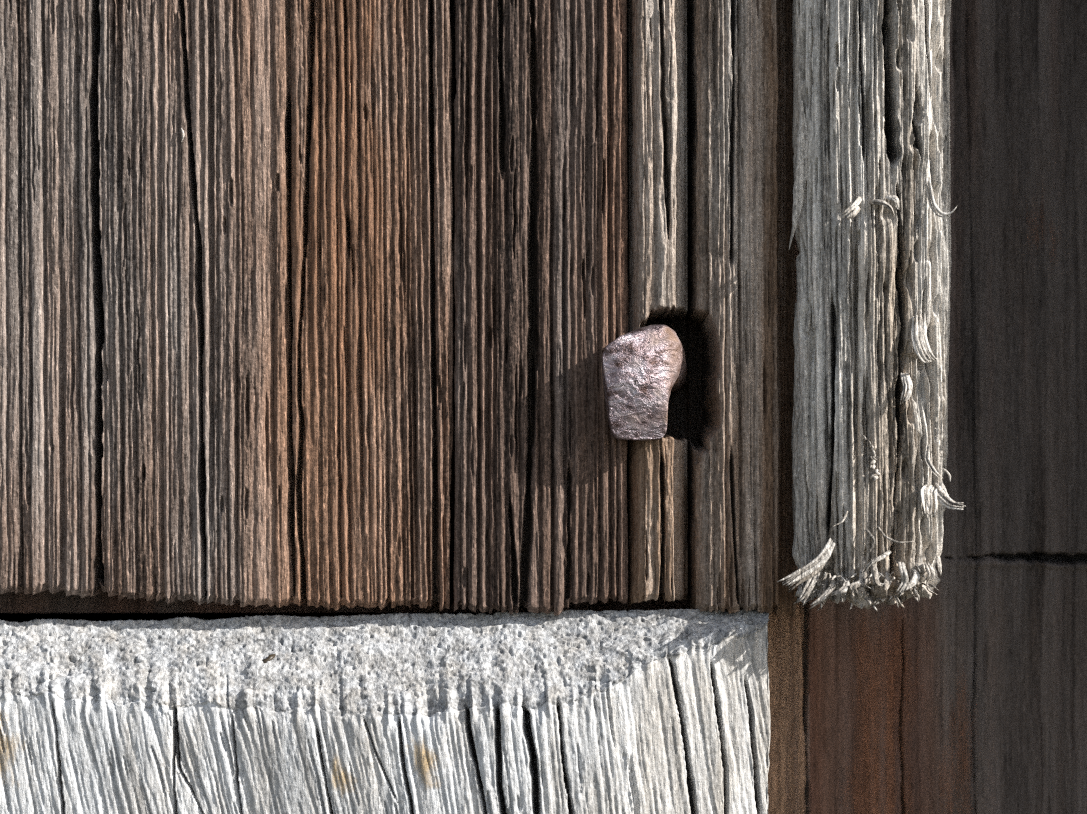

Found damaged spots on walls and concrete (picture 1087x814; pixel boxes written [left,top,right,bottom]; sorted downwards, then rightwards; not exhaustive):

crack [994,553,1087,564]